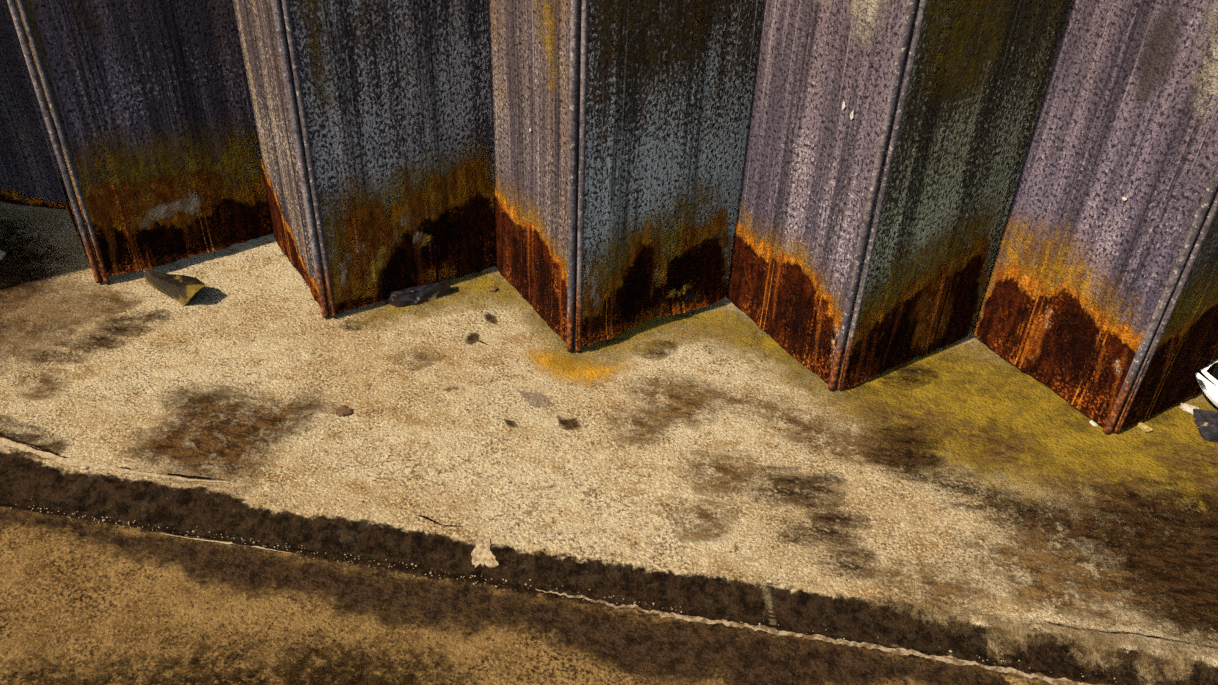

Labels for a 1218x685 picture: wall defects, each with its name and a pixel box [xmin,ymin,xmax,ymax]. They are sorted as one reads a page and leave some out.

damp [0,222,167,399]
corrosion [0,128,1218,432]
damp [0,418,65,457]
crack [0,435,230,483]
damp [130,388,322,478]
damp [343,270,1218,647]